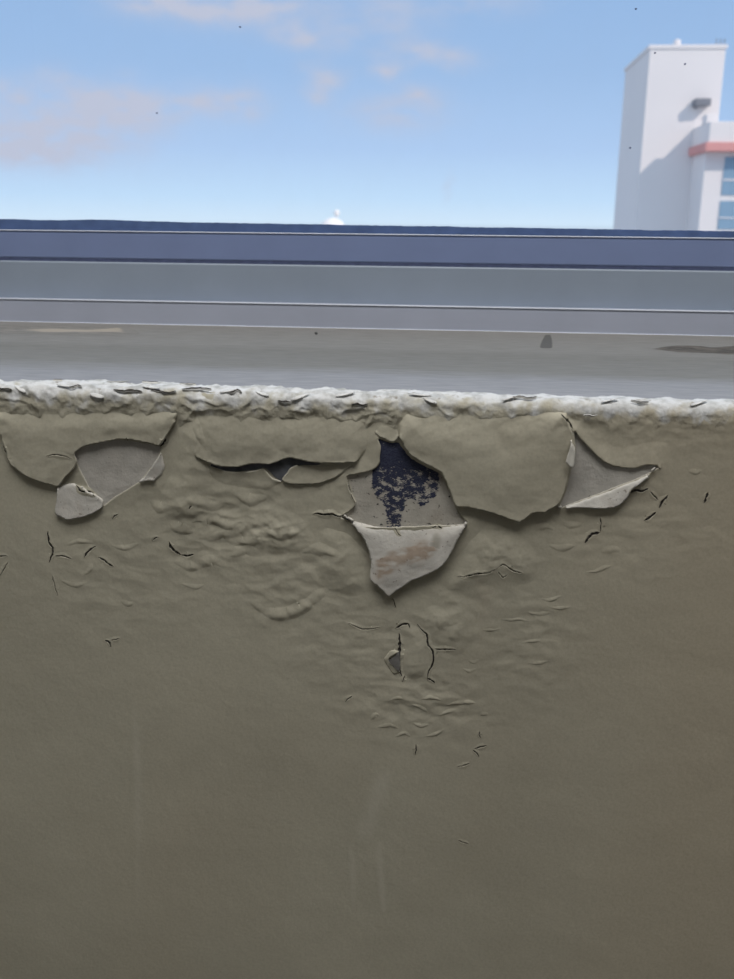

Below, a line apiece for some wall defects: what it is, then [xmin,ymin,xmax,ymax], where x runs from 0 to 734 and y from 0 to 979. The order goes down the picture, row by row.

crack [45,530,114,596]
peeling [0,379,734,597]
crack [583,517,605,543]
crack [629,485,669,523]
crack [348,598,456,683]